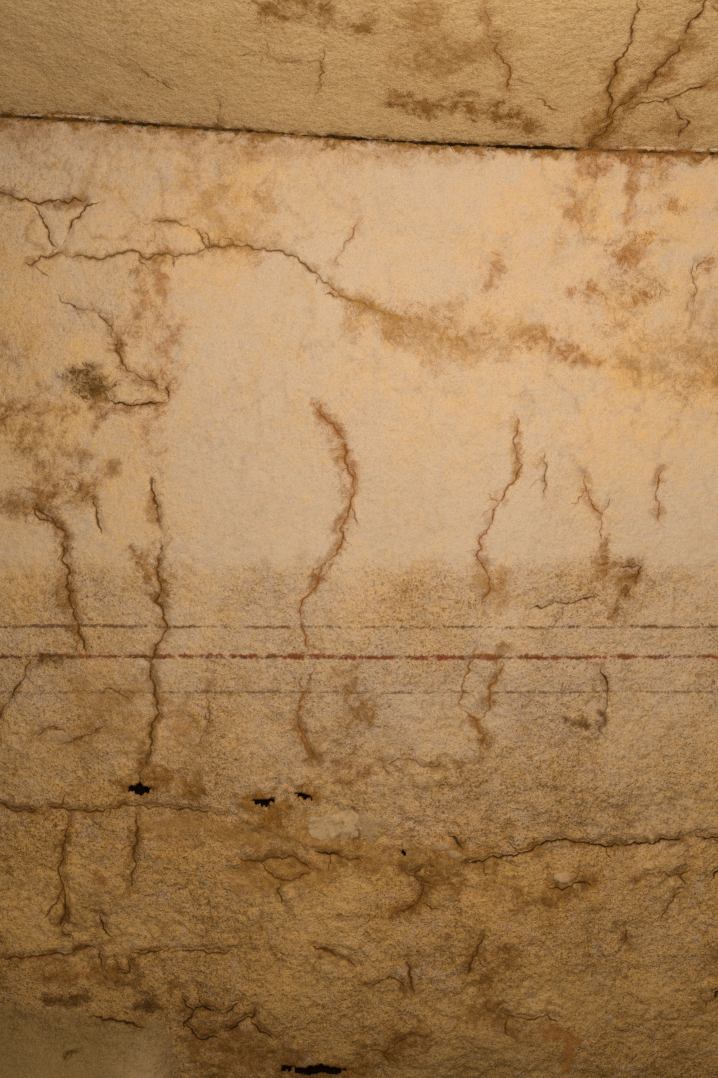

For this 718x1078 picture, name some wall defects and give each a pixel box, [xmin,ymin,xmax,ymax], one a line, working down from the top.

crack [0,0,718,166]
crack [0,192,395,407]
leakage [0,483,68,546]
crack [297,403,358,758]
crack [476,415,548,602]
crack [528,596,596,610]
crack [575,477,610,536]
crack [0,479,233,973]
crack [458,654,504,747]
crack [395,835,718,921]